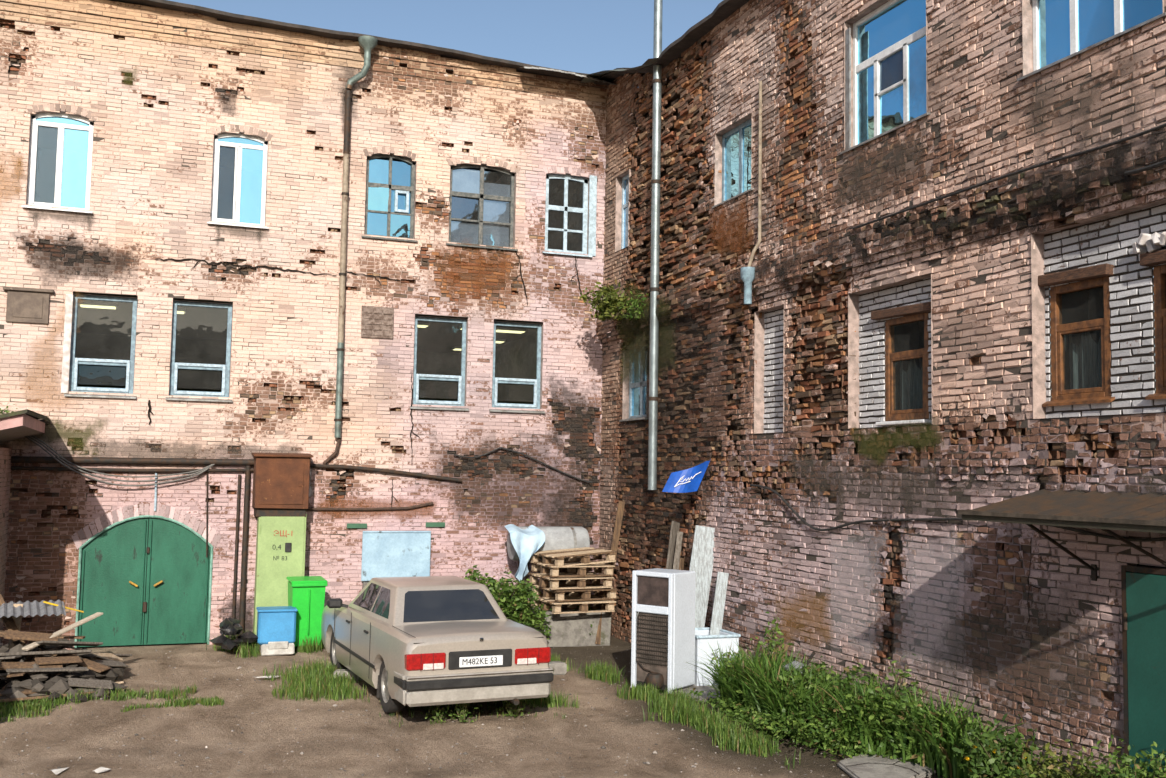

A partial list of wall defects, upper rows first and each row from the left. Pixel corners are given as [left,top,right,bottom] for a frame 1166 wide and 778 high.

spalling [767,0,1166,248]
spalling [26,238,108,266]
crack [155,258,402,284]
spalling [300,249,325,265]
spalling [345,243,523,313]
peeling [527,218,597,329]
spalling [546,42,1028,629]
peeling [223,375,350,454]
damp [544,382,599,528]
spalling [1040,416,1137,490]